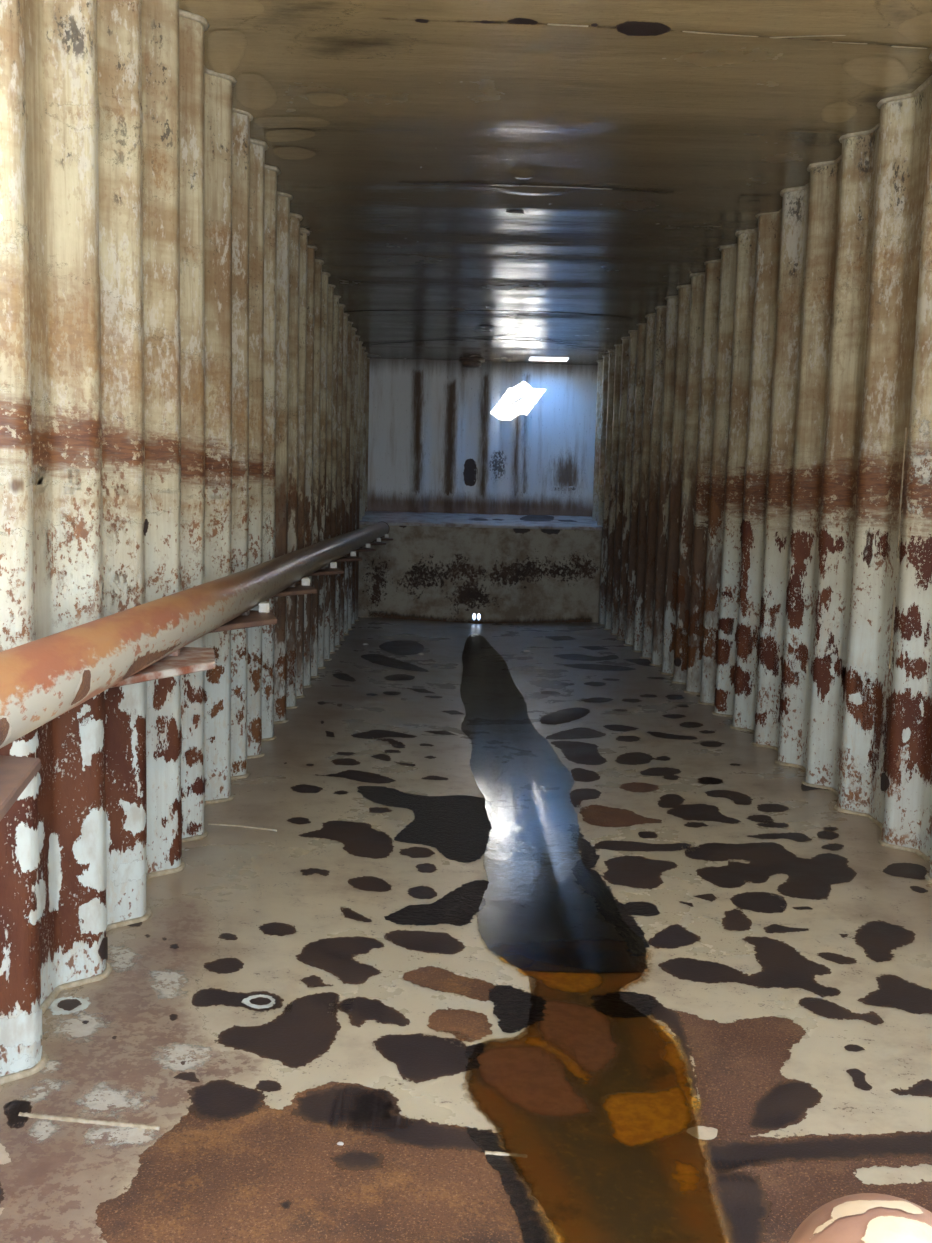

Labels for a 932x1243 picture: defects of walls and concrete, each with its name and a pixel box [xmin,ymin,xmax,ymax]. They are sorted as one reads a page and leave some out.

rust [0,202,932,735]
peeling [0,642,296,1147]
rust [0,896,559,1243]
peeling [149,730,495,1083]
peeling [360,640,465,715]
peeling [810,1200,932,1243]
rust [835,746,932,850]